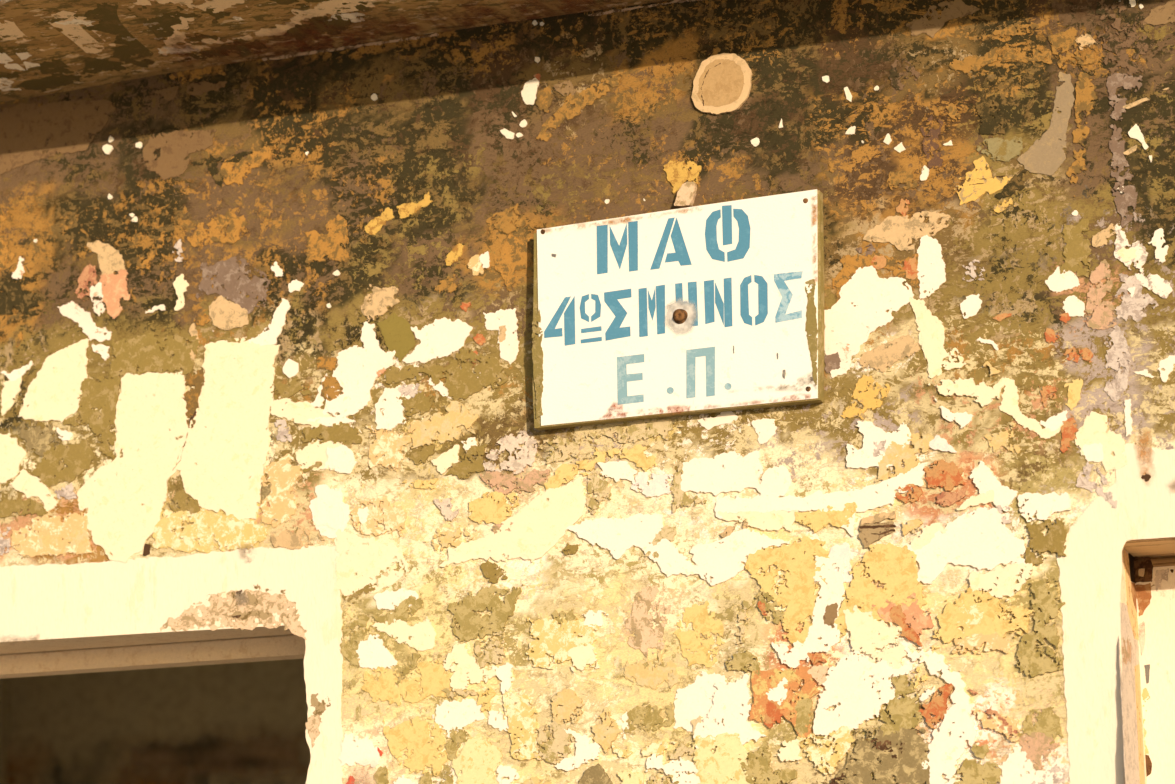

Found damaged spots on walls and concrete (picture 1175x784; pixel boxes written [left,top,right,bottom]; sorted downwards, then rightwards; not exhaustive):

peeling [0,0,377,175]
peeling [500,57,625,143]
peeling [136,210,248,269]
peeling [135,129,286,188]
peeling [305,214,350,276]
peeling [365,192,433,235]
peeling [434,203,534,294]
peeling [663,160,702,194]
peeling [824,0,1175,508]
rust [1139,432,1151,482]
peeling [0,236,1071,784]
peeling [1119,550,1174,784]